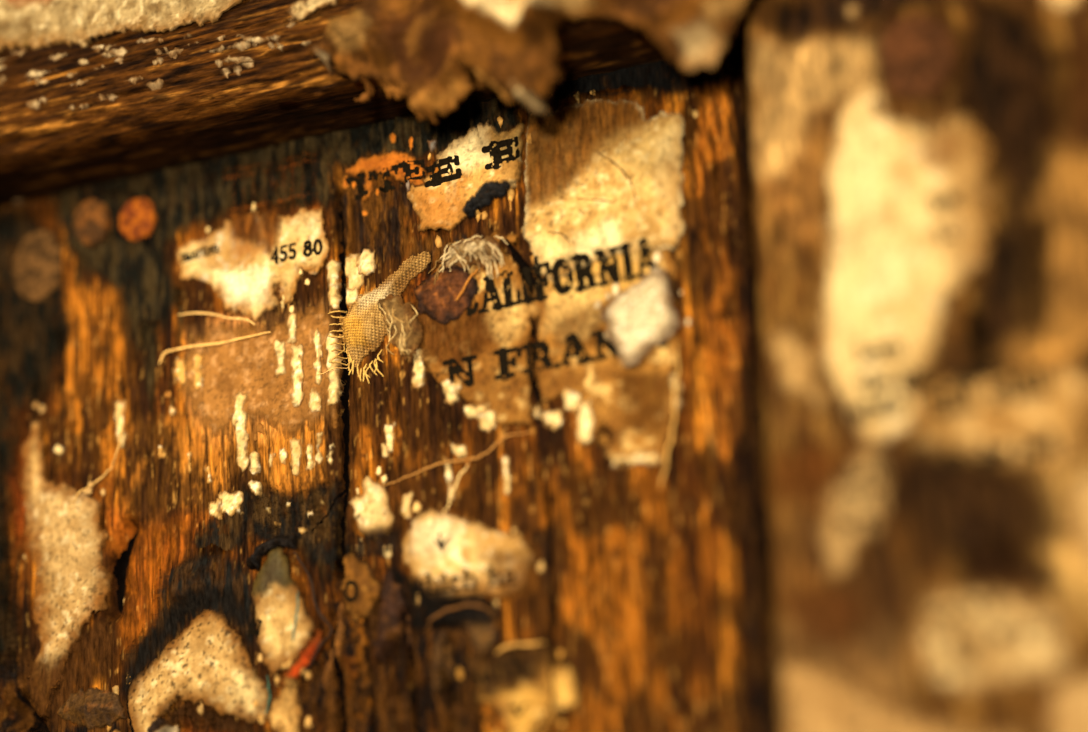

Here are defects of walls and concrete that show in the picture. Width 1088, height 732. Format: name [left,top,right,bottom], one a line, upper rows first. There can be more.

peeling [92,45,127,67]
peeling [212,23,293,79]
peeling [327,249,374,309]
peeling [274,294,346,411]
peeling [412,349,424,388]
peeling [114,400,127,448]
peeling [442,380,496,432]
peeling [530,389,609,445]
peeling [376,425,394,485]
peeling [446,444,466,500]
peeling [502,456,511,494]
peeling [402,493,422,519]